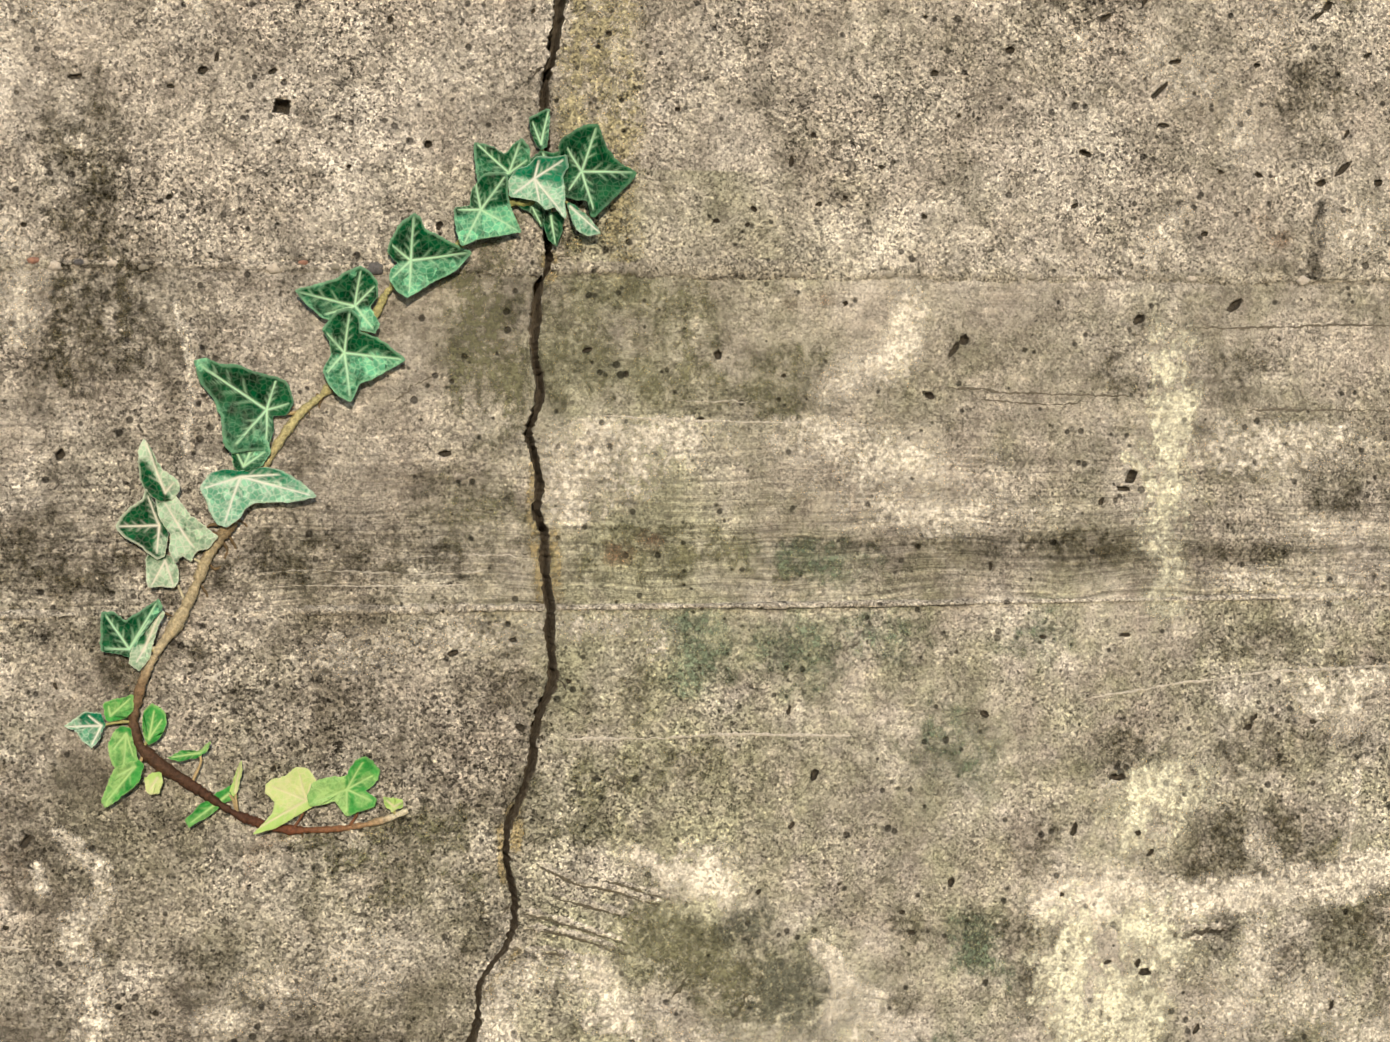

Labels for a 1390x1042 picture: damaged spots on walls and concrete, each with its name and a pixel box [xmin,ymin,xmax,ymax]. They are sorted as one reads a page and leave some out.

crack [532,0,567,152]
crack [265,208,870,1042]